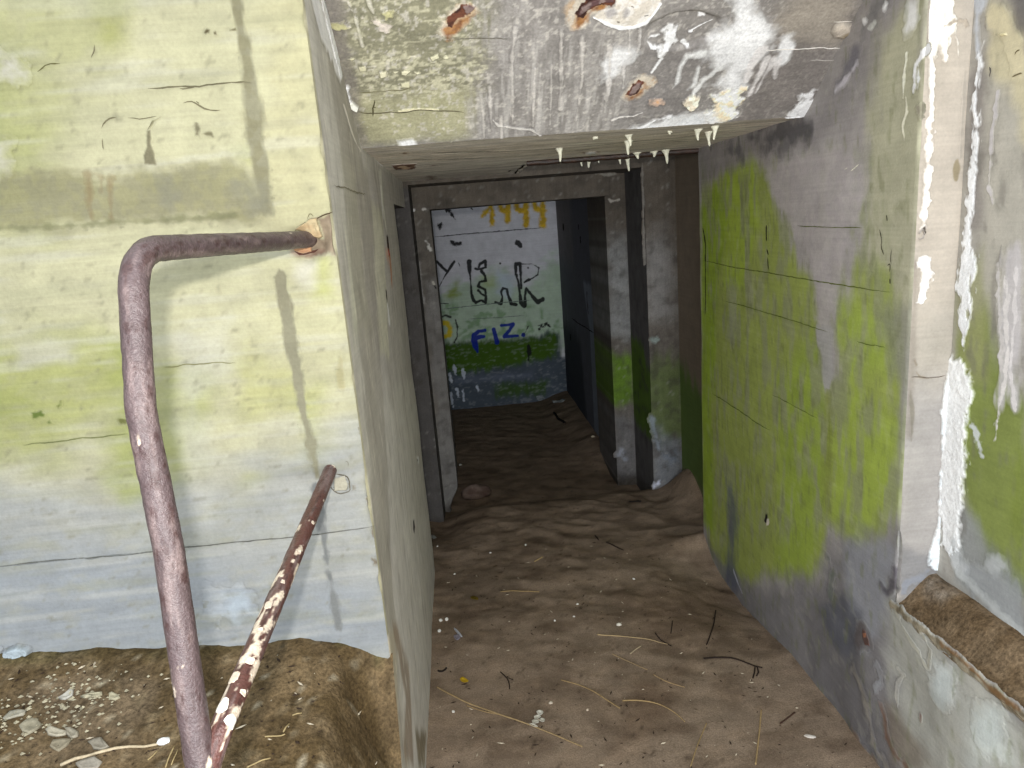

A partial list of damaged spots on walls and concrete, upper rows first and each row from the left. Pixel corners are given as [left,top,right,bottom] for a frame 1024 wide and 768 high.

rust [434,0,483,44]
rust [560,0,615,33]
spalling [592,0,663,30]
crack [148,81,250,111]
rust [619,69,659,103]
damp [0,0,278,244]
damp [479,0,869,515]
damp [832,0,1024,636]
damp [272,266,323,498]
crack [0,551,153,567]
crack [185,526,372,548]
damp [315,502,344,633]